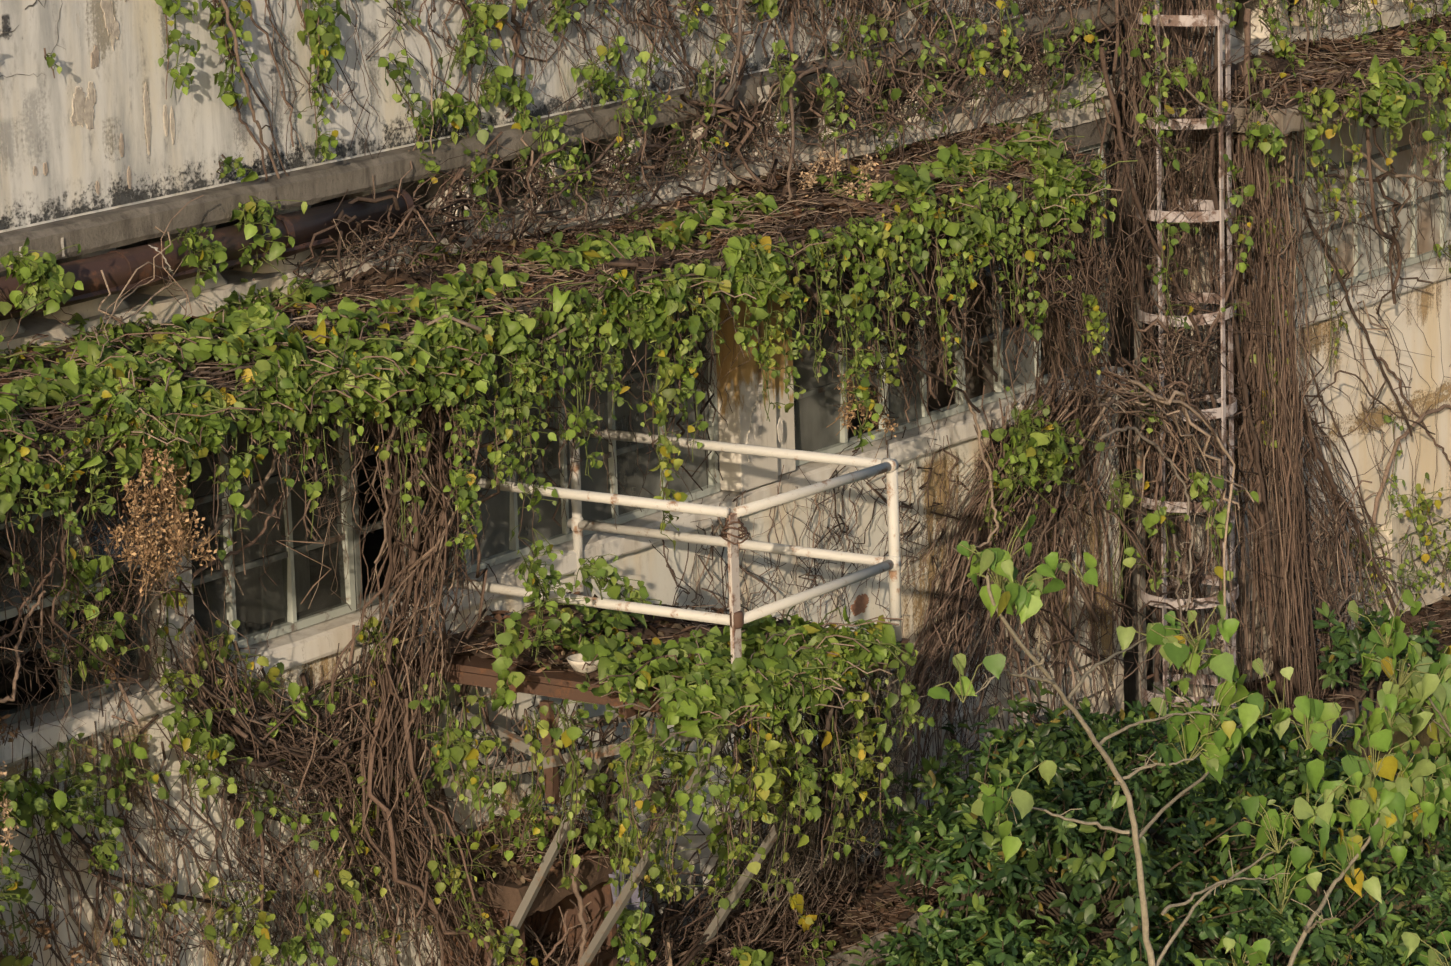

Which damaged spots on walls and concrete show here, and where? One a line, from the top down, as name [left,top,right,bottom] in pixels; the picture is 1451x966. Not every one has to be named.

crack [0,0,63,77]
peeling [70,0,128,131]
leakage [0,0,1083,230]
leakage [1322,381,1451,441]